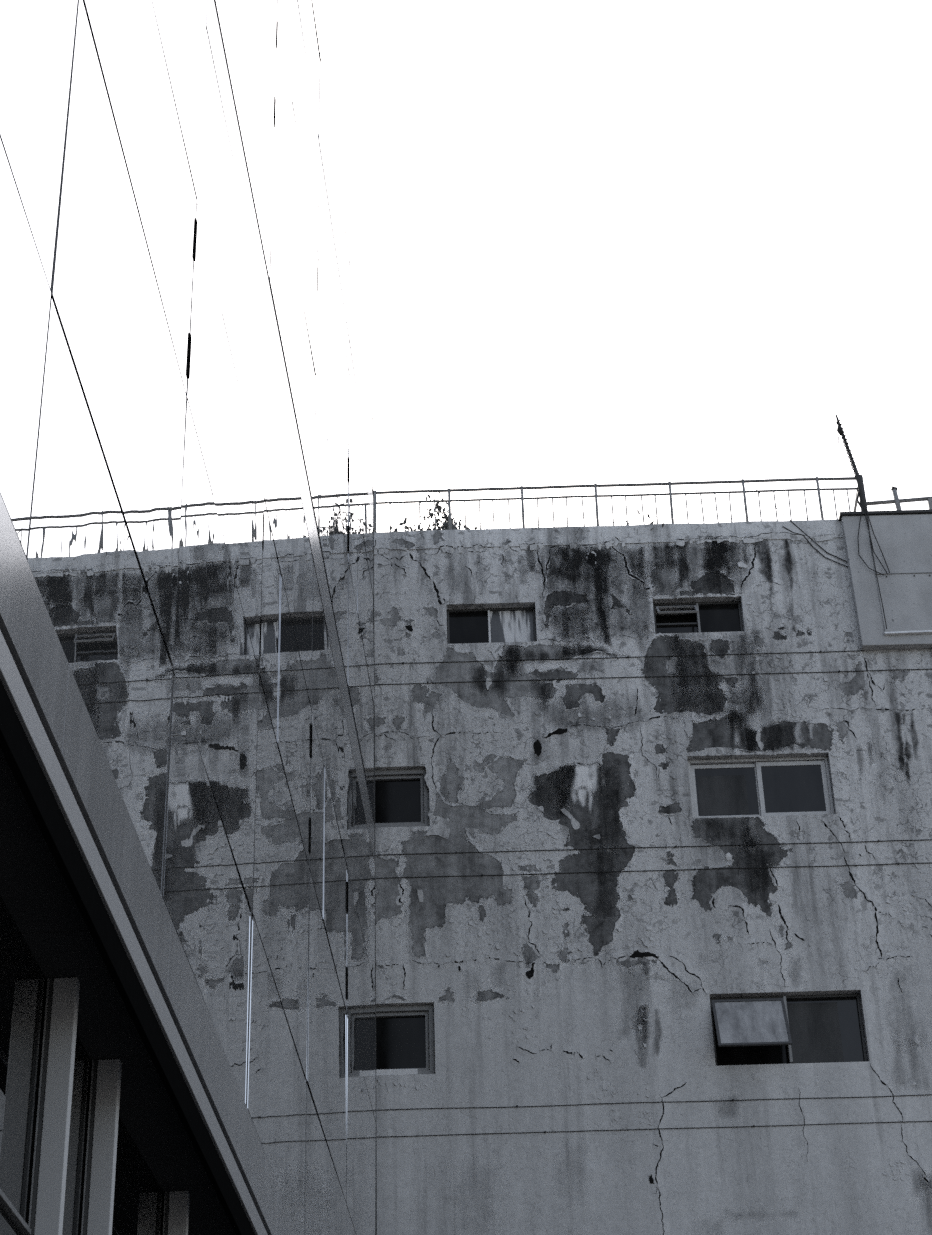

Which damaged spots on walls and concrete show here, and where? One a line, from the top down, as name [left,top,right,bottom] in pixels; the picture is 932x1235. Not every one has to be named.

peeling [379,605,440,638]
peeling [538,590,589,628]
peeling [611,594,634,616]
water stain [547,539,734,657]
water stain [754,540,793,582]
water stain [476,649,547,690]
water stain [896,713,917,778]
peeling [375,642,663,979]
water stain [568,764,618,841]
crack [791,813,932,993]
crack [648,1078,691,1235]
crack [864,1063,932,1194]